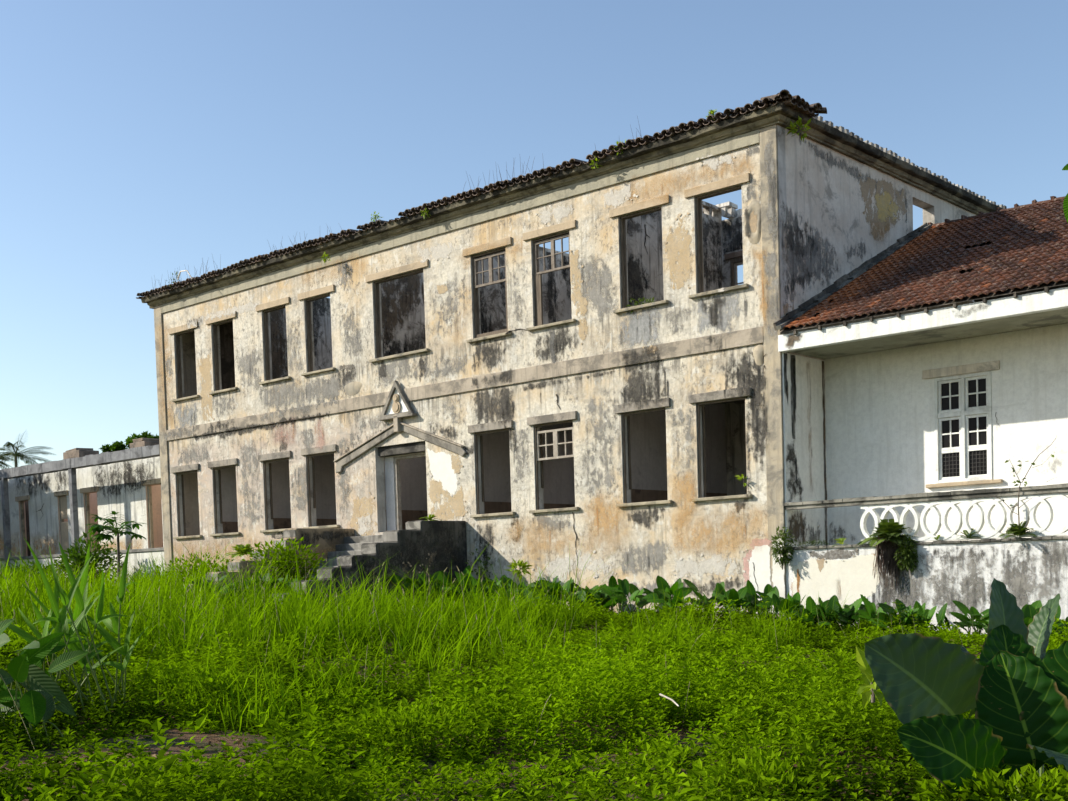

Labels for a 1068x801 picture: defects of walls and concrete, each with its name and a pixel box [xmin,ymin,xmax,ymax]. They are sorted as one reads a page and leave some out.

peeling [858,173,907,239]
peeling [664,212,694,290]
water stain [343,311,361,355]
water stain [376,217,767,513]
water stain [746,141,866,545]
water stain [165,310,354,522]
water stain [16,472,69,496]
water stain [93,462,157,495]
peeling [427,448,467,521]
water stain [628,508,665,528]
water stain [621,541,669,598]
water stain [872,542,1068,614]